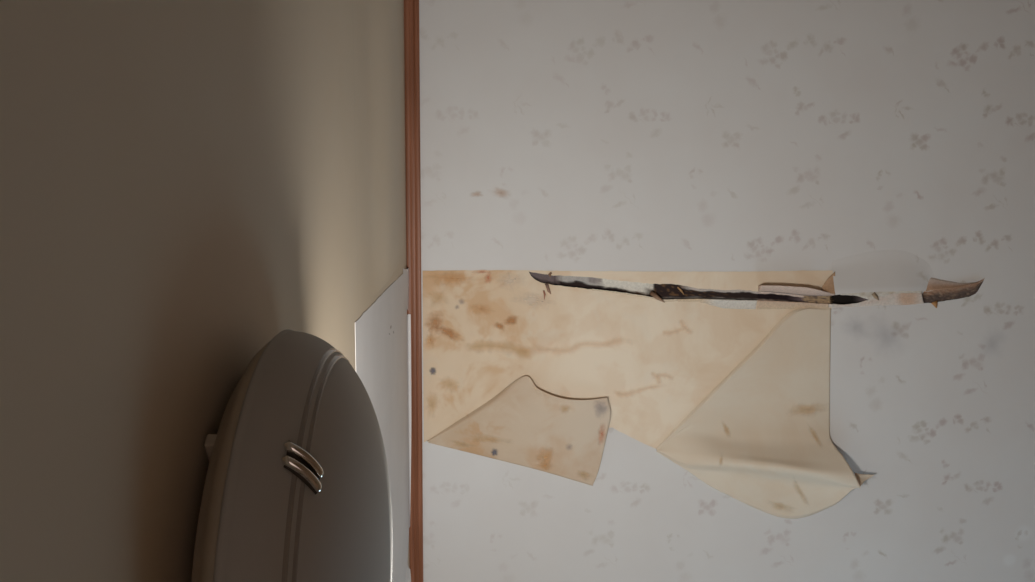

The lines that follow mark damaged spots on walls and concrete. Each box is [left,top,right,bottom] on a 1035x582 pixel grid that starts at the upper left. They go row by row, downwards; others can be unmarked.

crack [529,250,985,309]